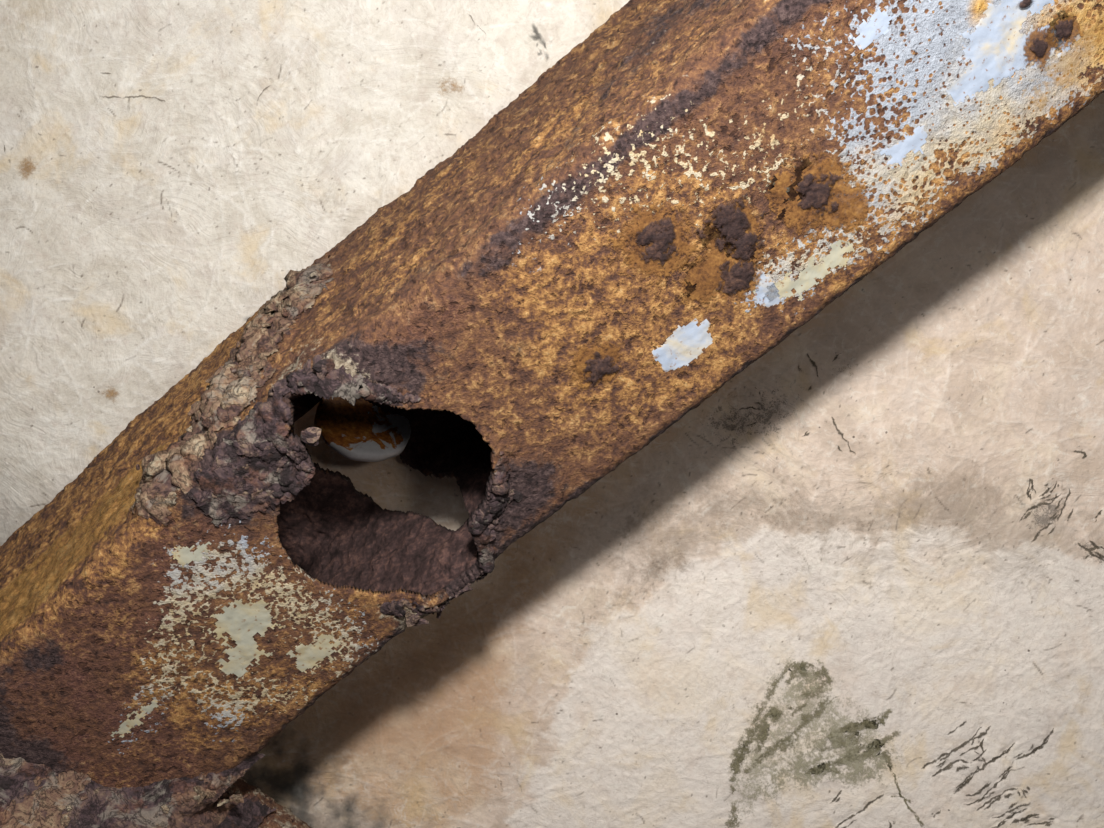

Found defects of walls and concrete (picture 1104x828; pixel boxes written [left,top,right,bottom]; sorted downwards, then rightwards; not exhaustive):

peeling [849,7,897,50]
peeling [941,0,1081,106]
corrosion [1024,7,1085,71]
peeling [879,125,928,169]
corrosion [608,149,876,307]
peeling [752,240,855,308]
corrosion [128,255,333,527]
peeling [207,599,281,680]
peeling [286,634,344,673]
damp [726,661,899,828]
corrosion [0,771,91,828]
corrosion [156,768,249,828]